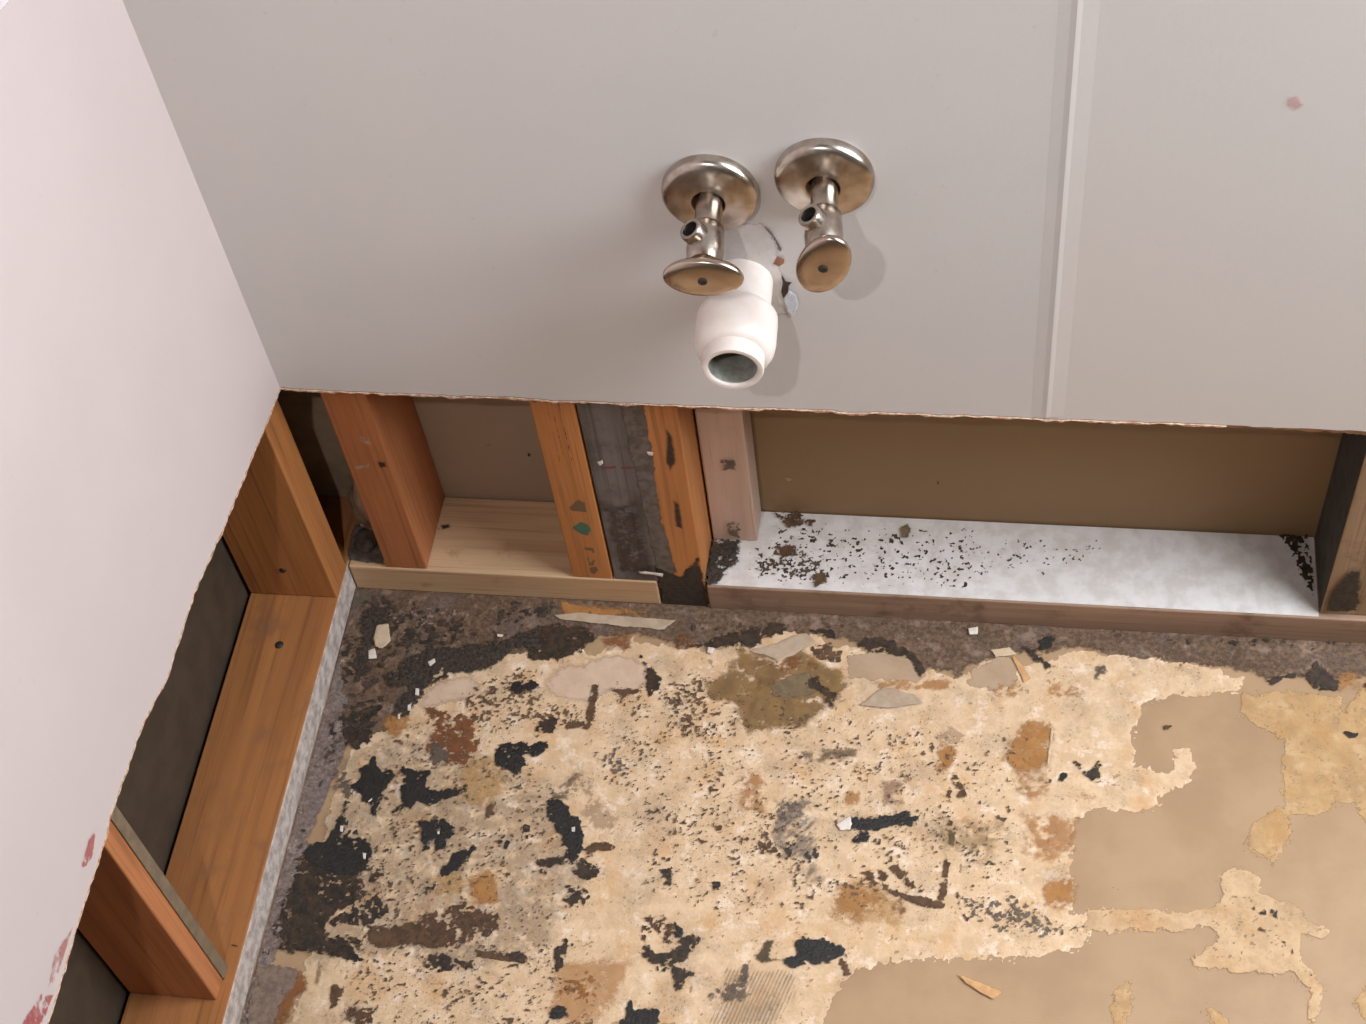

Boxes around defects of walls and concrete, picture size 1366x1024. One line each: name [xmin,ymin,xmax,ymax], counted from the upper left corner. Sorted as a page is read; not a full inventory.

mould [704,511,1100,588]
damp [1279,534,1362,612]
peeling [368,624,391,659]
peeling [420,677,480,708]
peeling [545,655,647,702]
spalling [750,633,815,661]
peeling [847,650,925,708]
peeling [967,647,1030,691]
damp [1044,761,1103,783]
peeling [582,782,614,828]
damp [262,589,1088,1024]